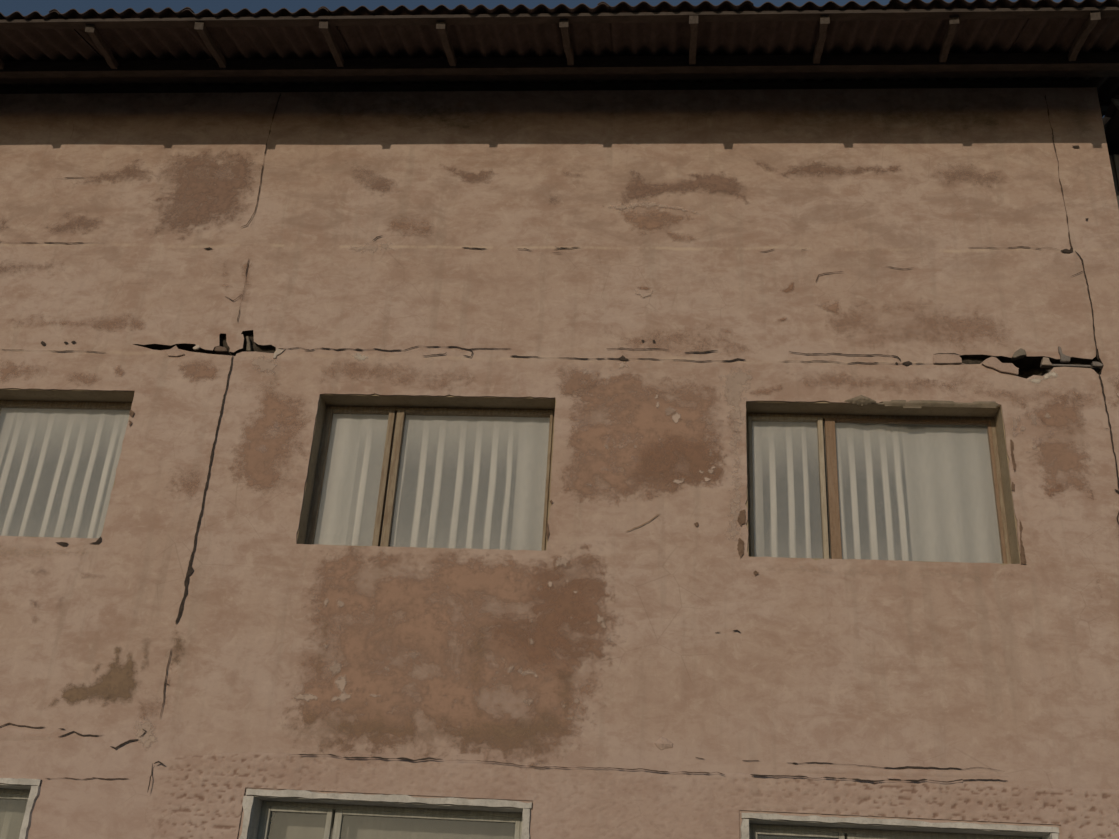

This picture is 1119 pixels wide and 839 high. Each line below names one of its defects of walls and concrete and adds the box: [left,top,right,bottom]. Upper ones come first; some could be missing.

crack [242,93,281,227]
crack [969,96,1119,523]
spalling [133,330,286,379]
crack [278,346,745,362]
crack [789,351,960,364]
spalling [933,346,1104,379]
peeling [1010,395,1087,495]
crack [294,754,1007,782]